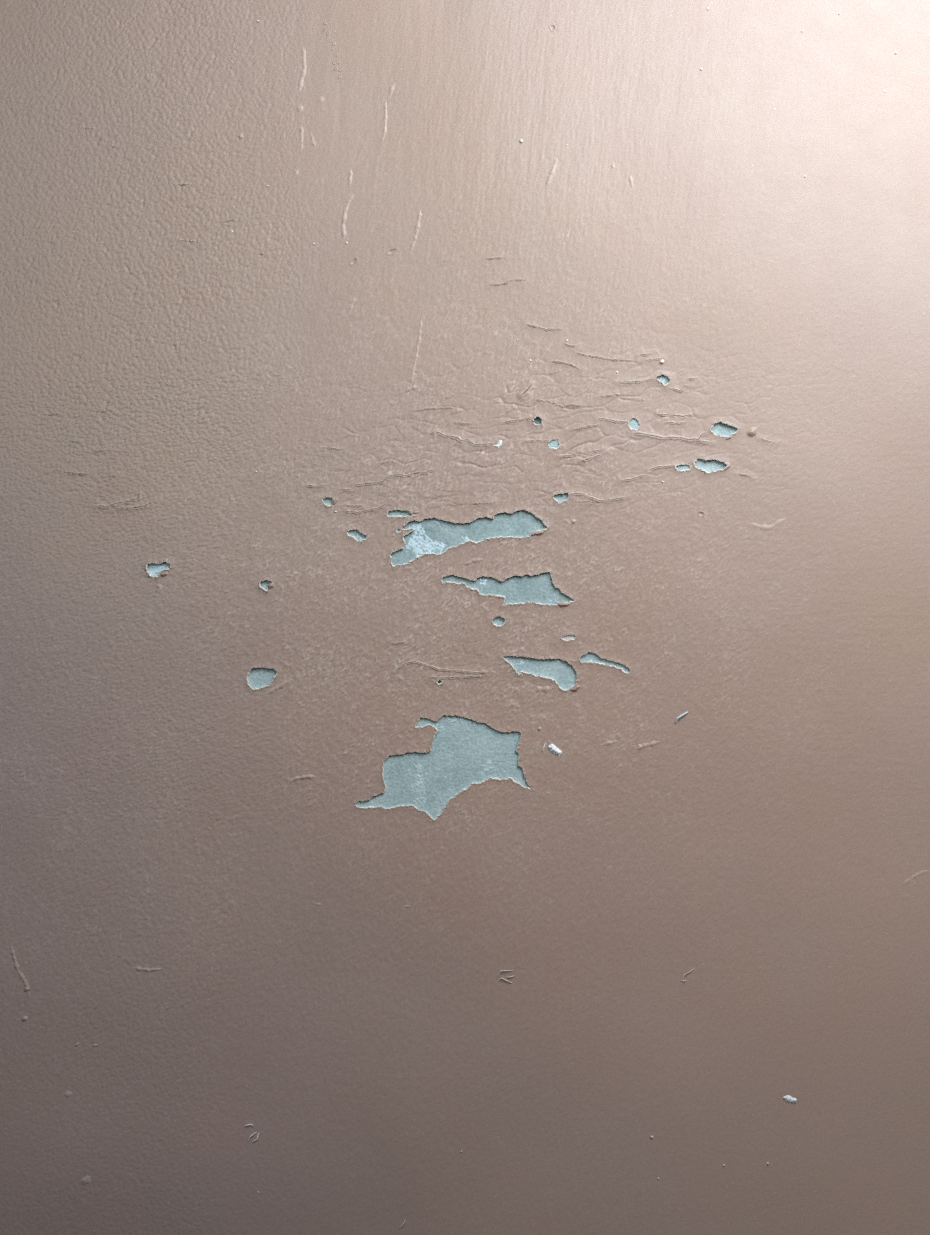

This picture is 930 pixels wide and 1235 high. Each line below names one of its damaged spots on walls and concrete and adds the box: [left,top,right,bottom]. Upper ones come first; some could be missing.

peeling [708,419,741,440]
peeling [673,457,731,475]
peeling [385,507,550,569]
peeling [144,559,173,579]
peeling [440,569,577,629]
peeling [245,665,280,692]
peeling [501,632,634,693]
peeling [353,712,532,823]